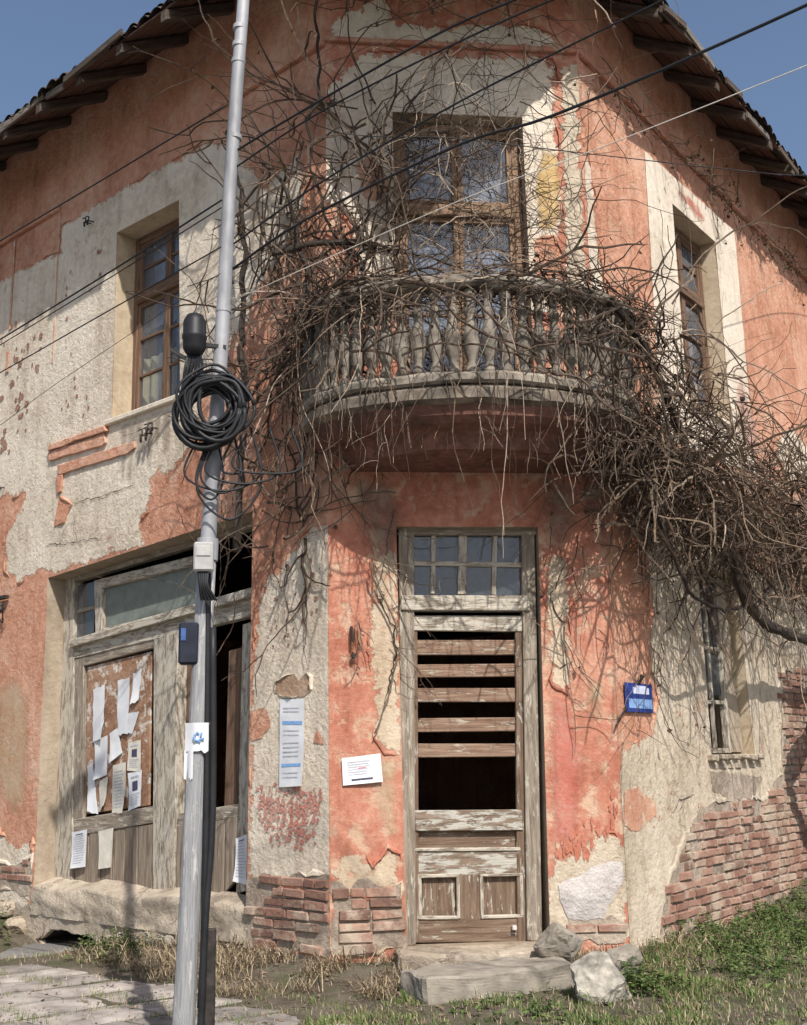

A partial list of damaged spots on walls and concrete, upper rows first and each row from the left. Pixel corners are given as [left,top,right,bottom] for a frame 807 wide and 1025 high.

flaking render [0,138,226,585]
flaking render [229,153,309,339]
flaking render [326,0,605,291]
flaking render [0,827,177,944]
flaking render [216,523,535,963]
flaking render [548,511,807,948]